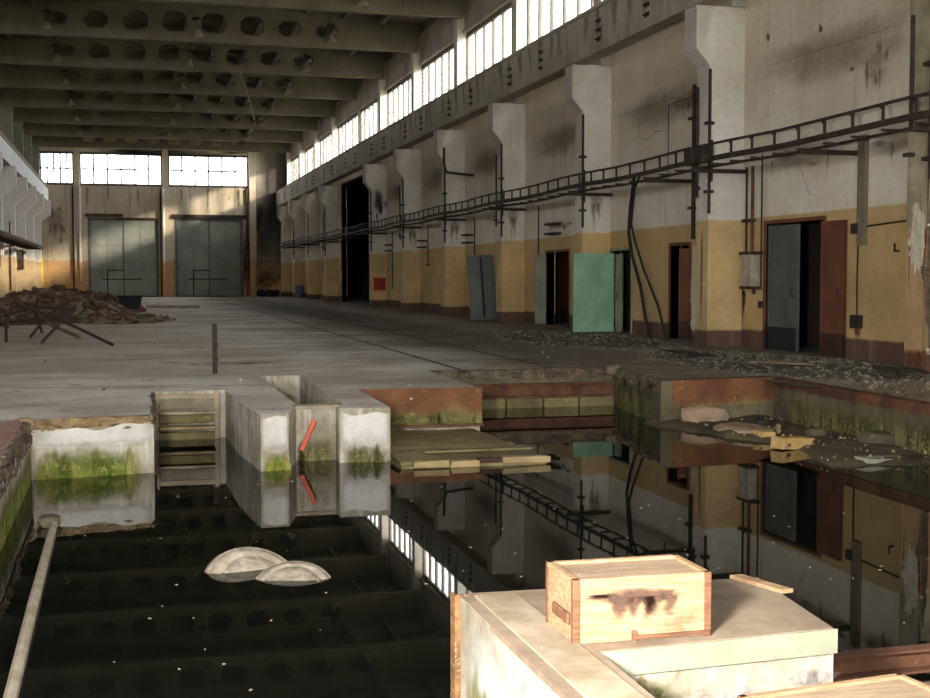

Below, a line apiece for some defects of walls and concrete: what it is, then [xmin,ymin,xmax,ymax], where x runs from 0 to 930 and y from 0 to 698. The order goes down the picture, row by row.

peeling [907,203,930,365]
peeling [0,390,239,500]
damp [273,444,312,471]